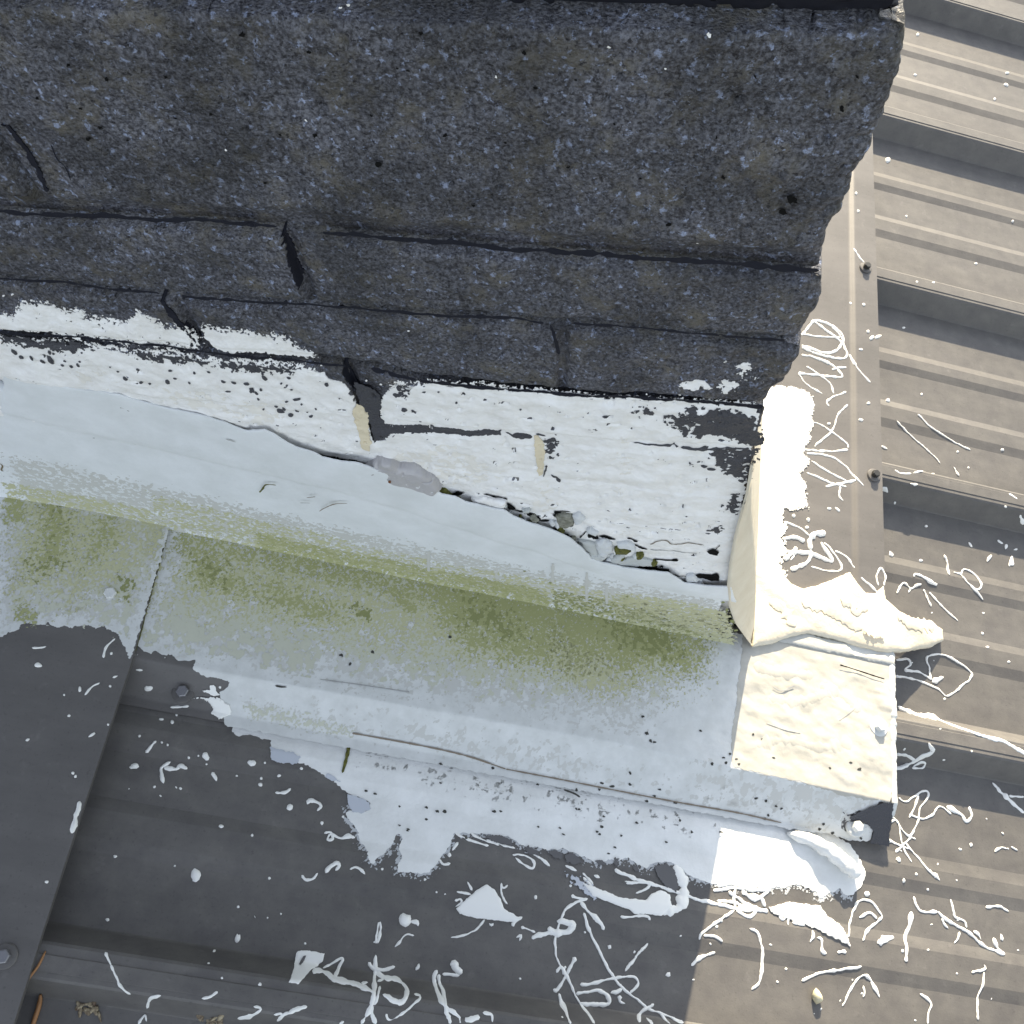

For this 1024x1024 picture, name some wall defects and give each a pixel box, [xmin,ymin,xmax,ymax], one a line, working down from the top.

peeling [0,335,97,368]
peeling [109,348,317,418]
peeling [393,386,440,413]
crack [320,423,374,464]
peeling [536,433,561,482]
peeling [631,404,765,515]
crack [484,494,720,581]
water stain [0,452,875,837]